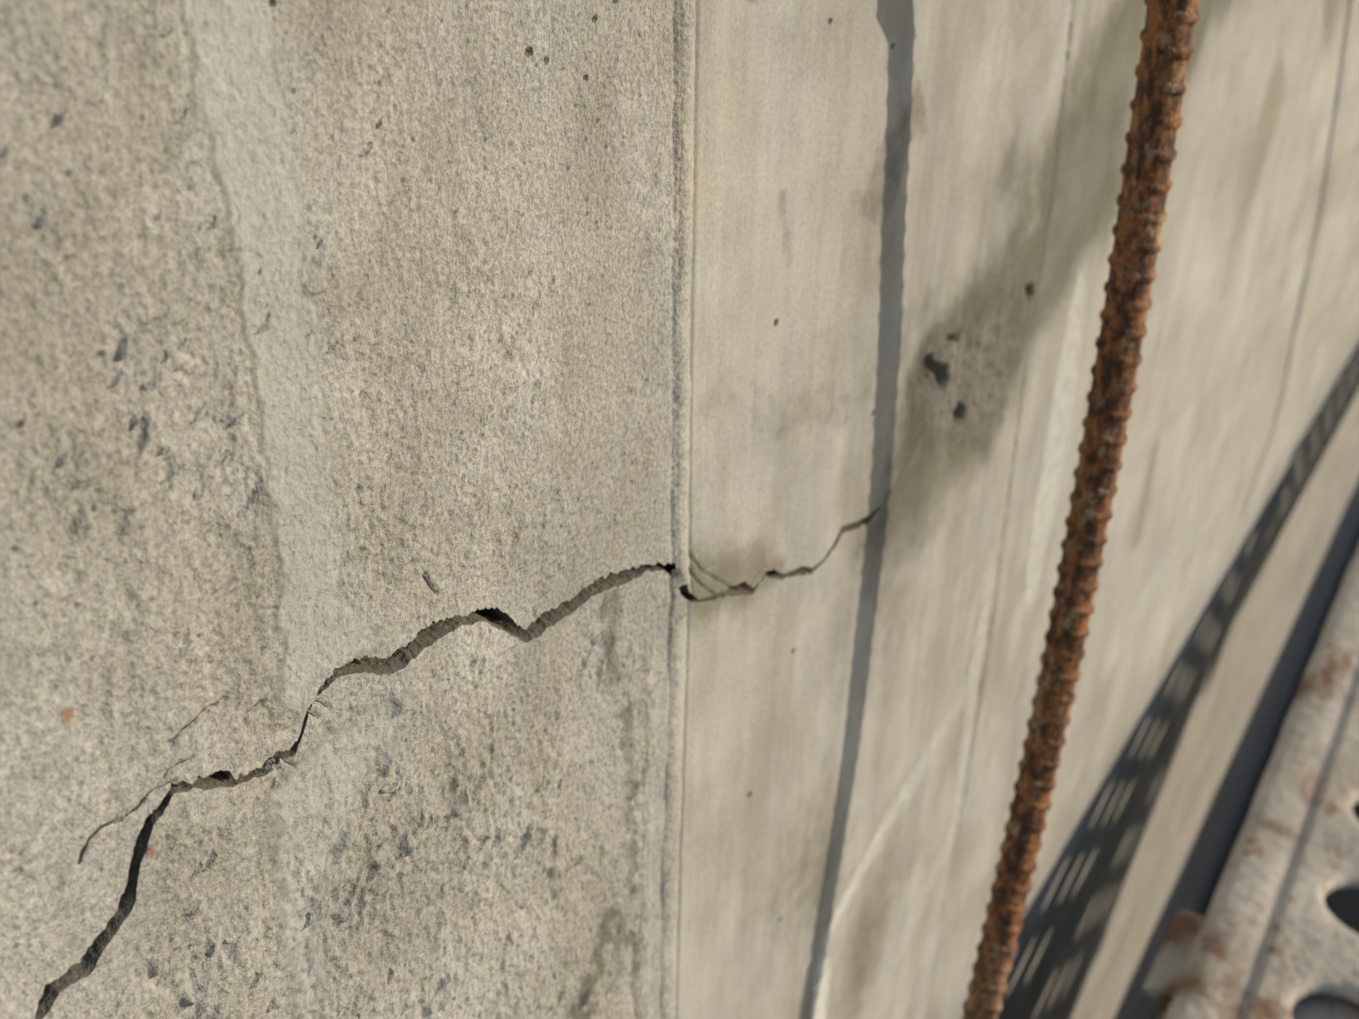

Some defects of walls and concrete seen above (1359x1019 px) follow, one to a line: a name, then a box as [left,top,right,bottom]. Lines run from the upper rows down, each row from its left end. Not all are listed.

damp [877,0,1147,604]
damp [1187,0,1215,78]
crack [35,480,899,1019]